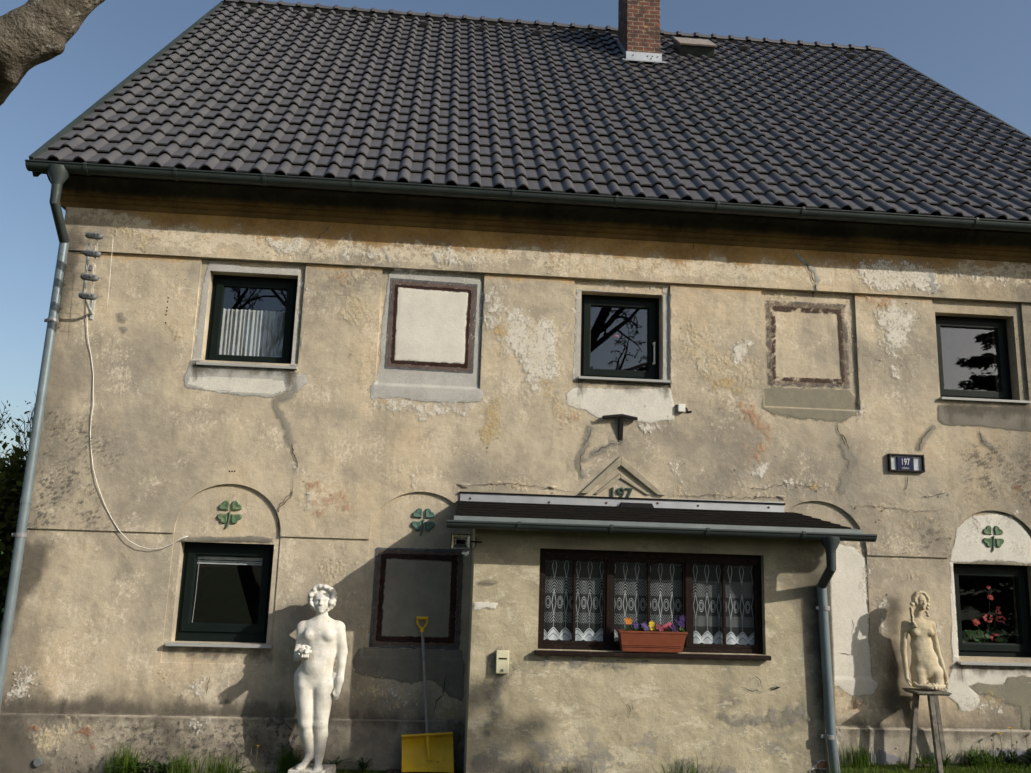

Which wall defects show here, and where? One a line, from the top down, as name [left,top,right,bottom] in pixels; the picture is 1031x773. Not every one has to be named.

peeling [264,237,306,257]
peeling [331,247,382,285]
crack [793,248,821,295]
peeling [399,243,568,396]
crack [273,372,298,533]
crack [474,426,623,494]
spalling [945,664,1031,730]
damp [0,697,300,773]